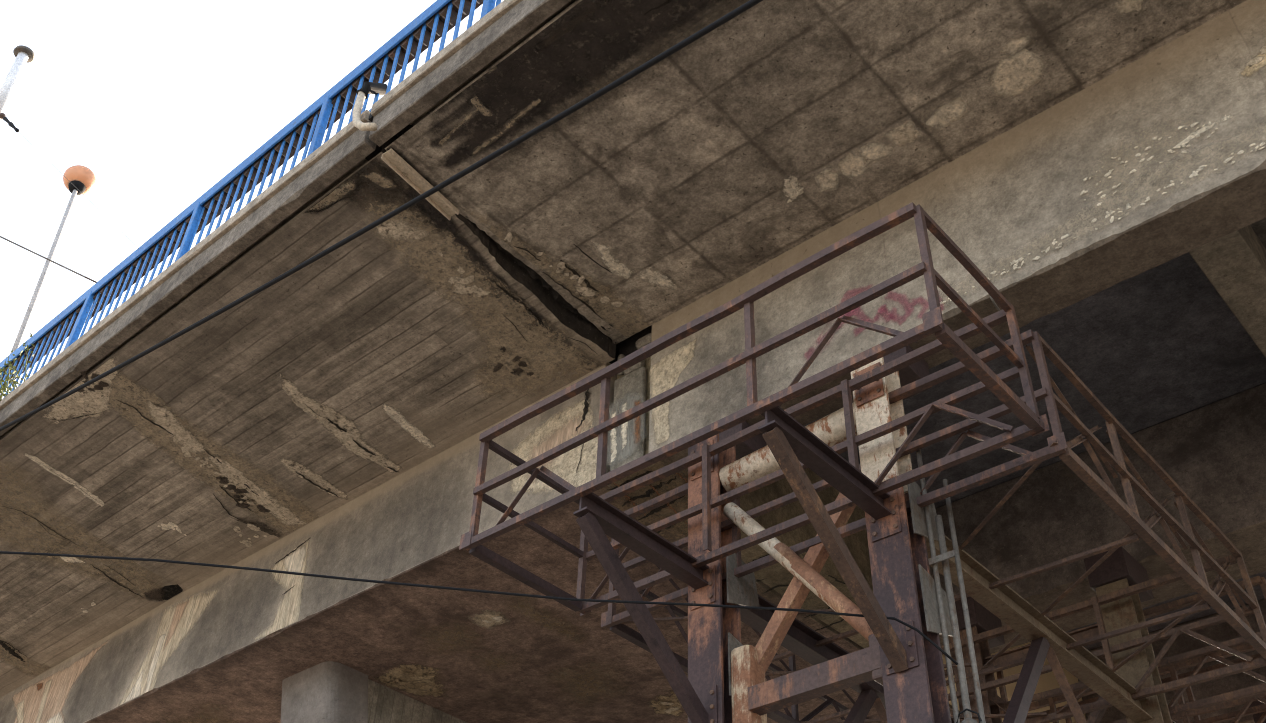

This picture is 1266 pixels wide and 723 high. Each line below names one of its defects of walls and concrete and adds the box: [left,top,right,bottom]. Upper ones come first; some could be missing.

leakage [430,0,748,168]
spalling [1241,46,1266,77]
leakage [332,146,605,395]
spalling [471,212,677,338]
spalling [940,115,1266,307]
spalling [42,356,118,424]
crack [576,389,591,473]
crack [0,638,50,675]